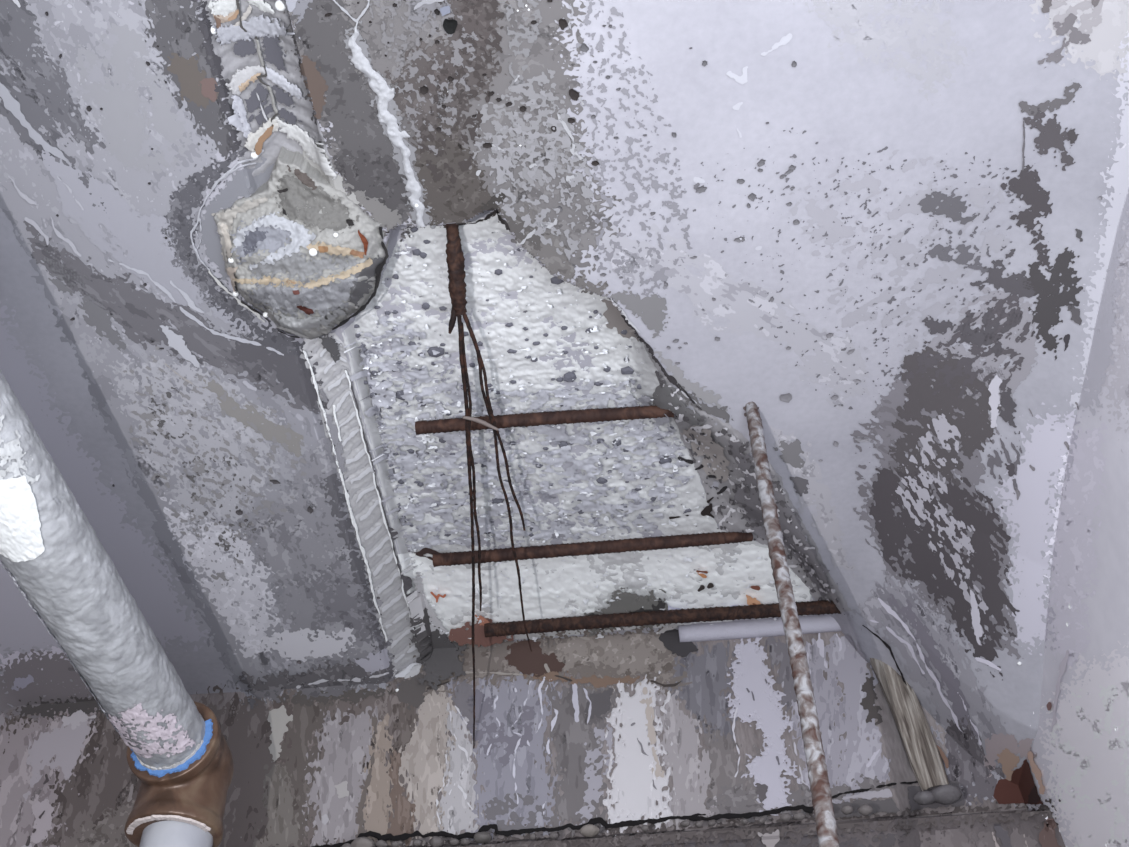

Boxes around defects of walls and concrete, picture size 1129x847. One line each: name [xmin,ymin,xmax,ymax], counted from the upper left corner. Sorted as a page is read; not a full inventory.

damp [0,0,874,847]
damp [761,0,1129,847]
spalling [342,214,852,847]
rust [696,570,714,592]
rust [746,586,761,605]
rust [984,733,1045,805]
crack [311,781,918,847]